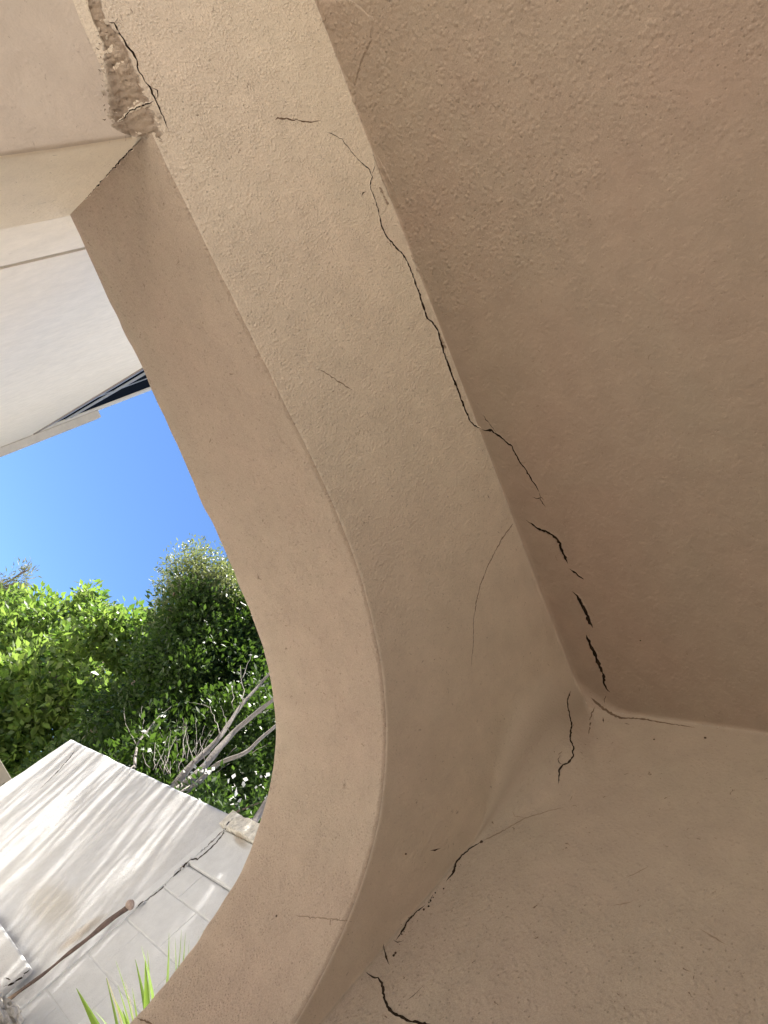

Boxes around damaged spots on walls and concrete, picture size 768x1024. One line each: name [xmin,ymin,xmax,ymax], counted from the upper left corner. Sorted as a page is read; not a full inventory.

flaking render [88,0,163,143]
crack [275,117,695,1024]